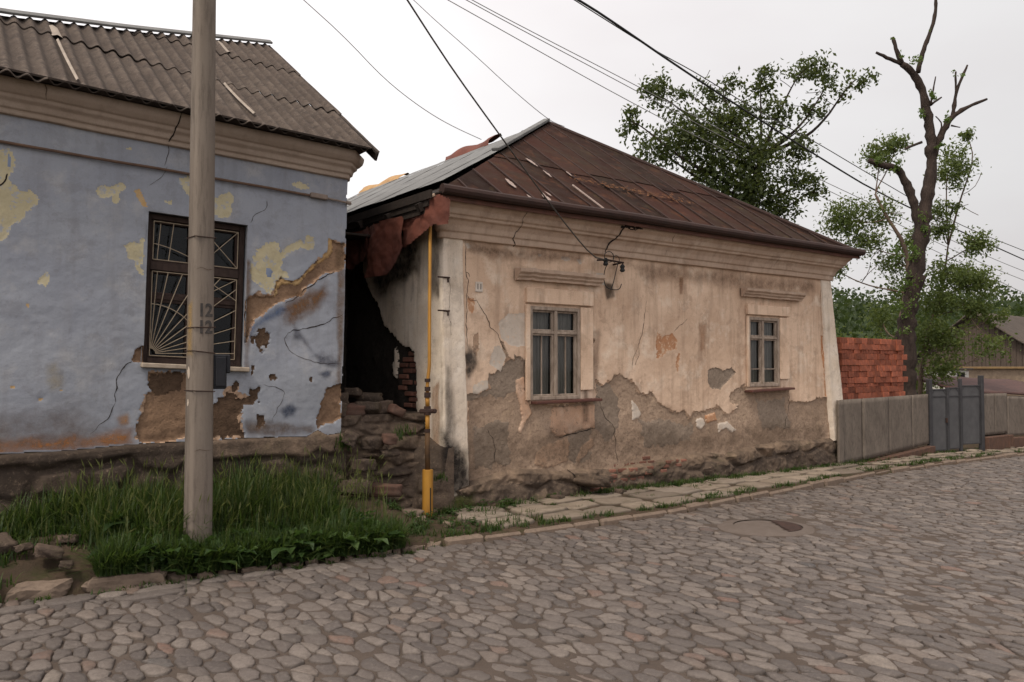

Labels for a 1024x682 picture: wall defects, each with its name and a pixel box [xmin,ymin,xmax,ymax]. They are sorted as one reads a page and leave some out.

crack [150,113,182,185]
peeling [0,148,40,241]
peeling [96,182,148,207]
peeling [124,238,145,275]
crack [284,315,342,365]
spalling [244,235,418,429]
crack [449,251,505,350]
crack [92,362,131,433]
spalling [131,345,186,443]
spalling [213,374,278,440]
spalling [467,332,830,492]